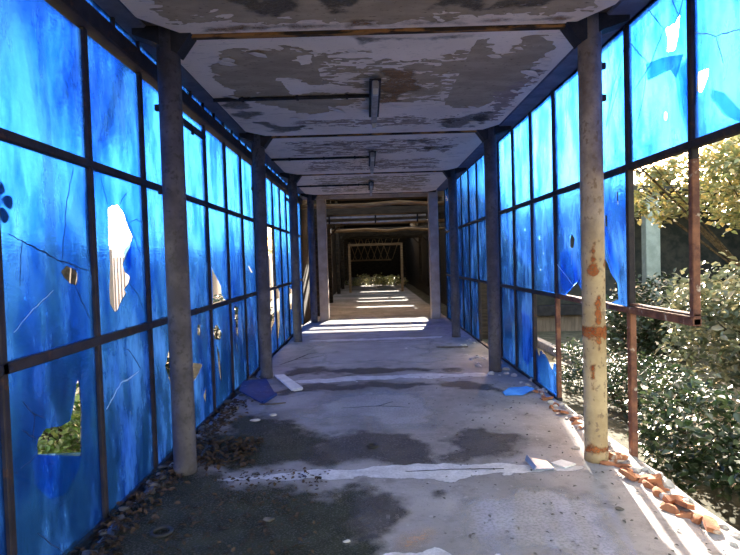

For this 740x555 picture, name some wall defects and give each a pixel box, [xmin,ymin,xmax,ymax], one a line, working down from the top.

peeling [140,0,598,26]
peeling [208,35,556,173]
rust [582,159,702,458]
damp [306,428,520,466]
damp [350,494,407,539]